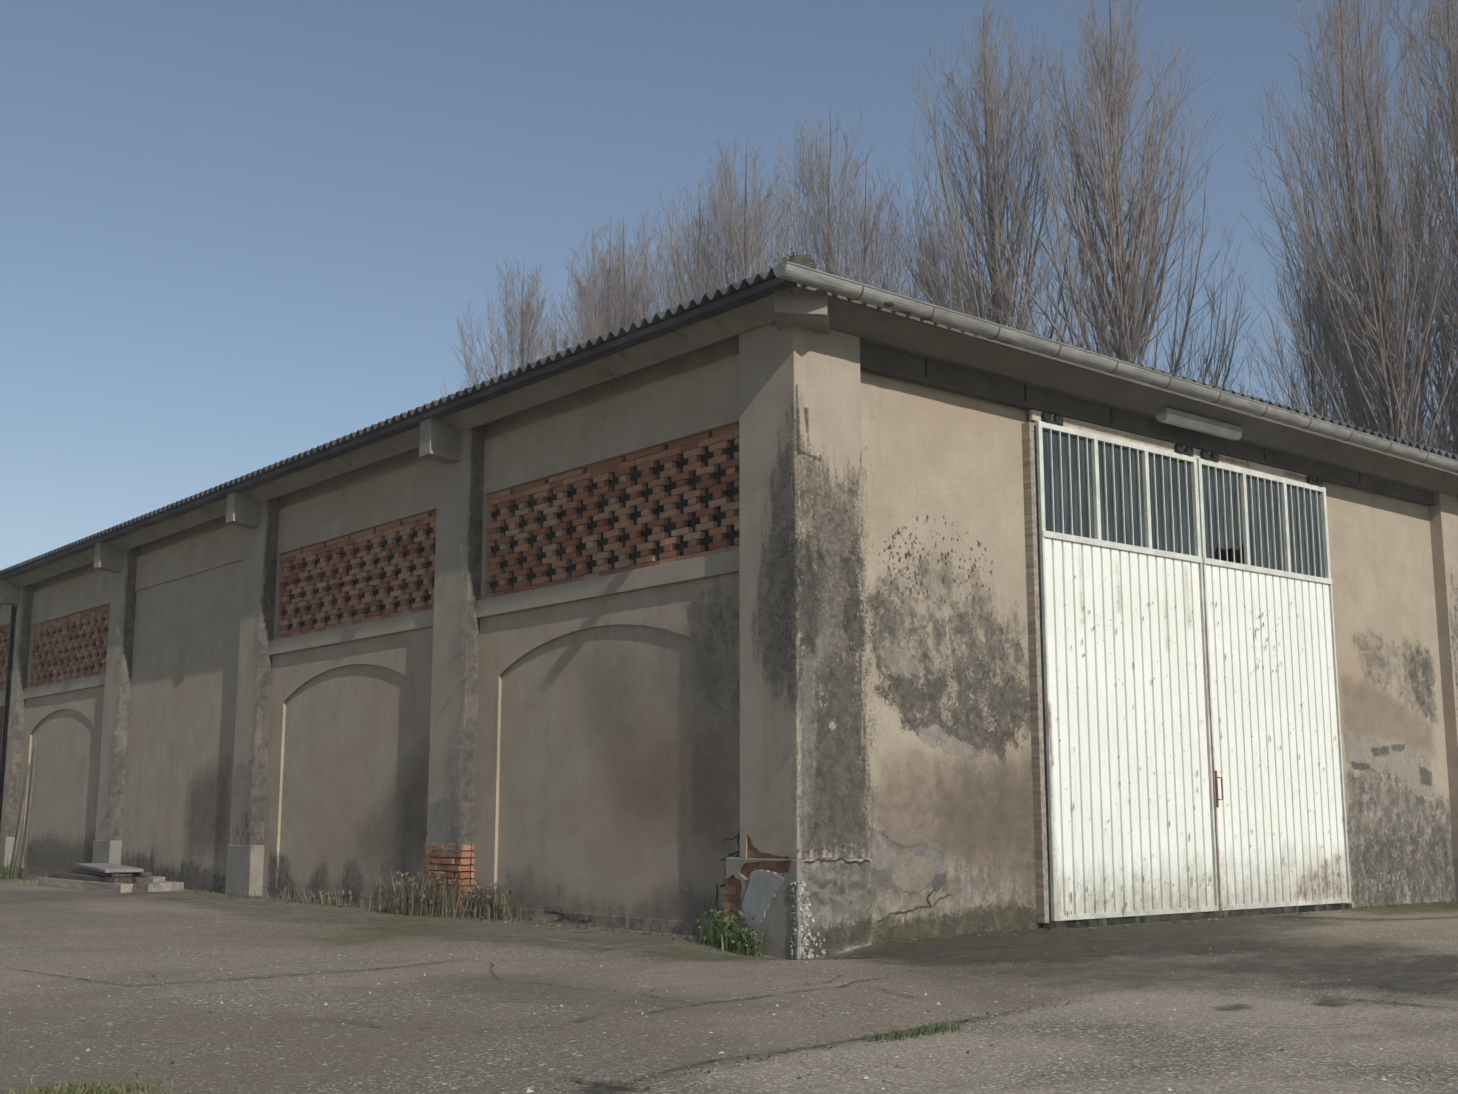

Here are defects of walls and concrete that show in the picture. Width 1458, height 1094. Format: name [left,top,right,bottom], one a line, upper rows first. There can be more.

flaking render [423,837,475,913]
flaking render [723,623,846,960]
damp [753,385,1458,1002]